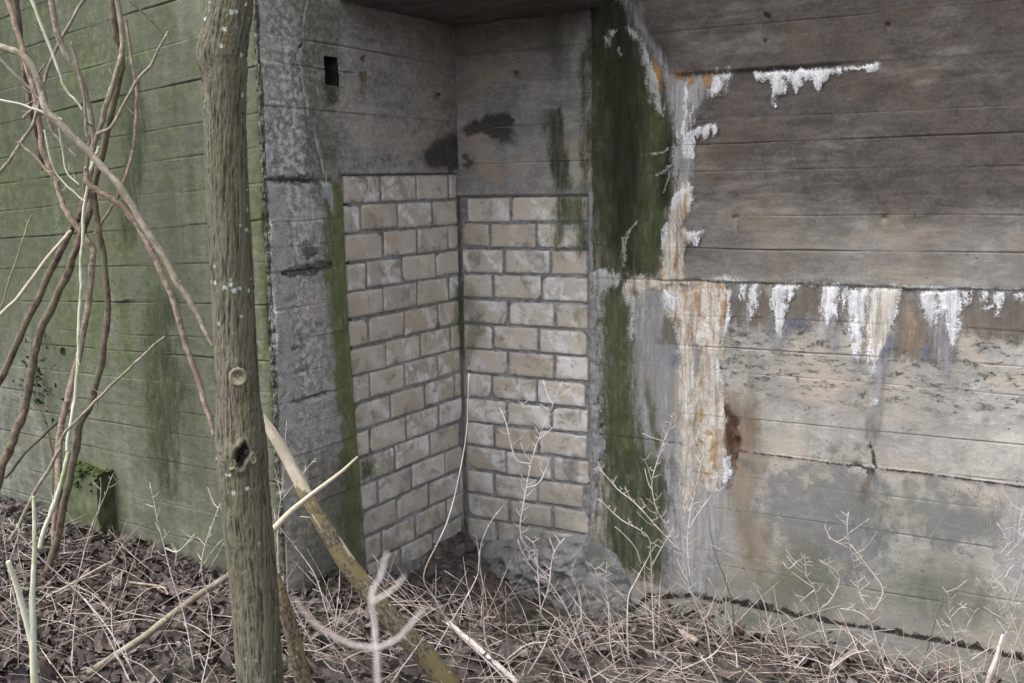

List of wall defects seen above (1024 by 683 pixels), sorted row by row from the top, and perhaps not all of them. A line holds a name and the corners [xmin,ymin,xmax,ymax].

damp [424,112,585,197]
damp [591,0,1024,595]